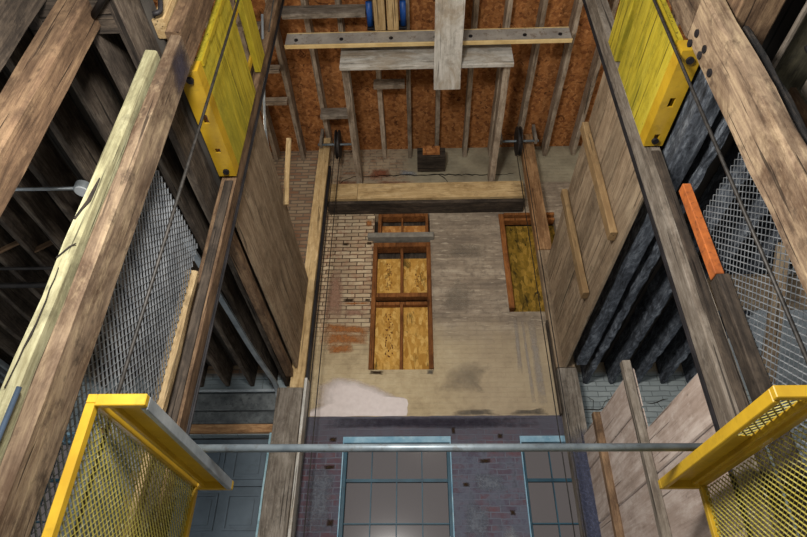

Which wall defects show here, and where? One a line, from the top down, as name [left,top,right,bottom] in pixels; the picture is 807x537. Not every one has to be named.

crack [74,178,100,219]
crack [4,243,76,388]
peeling [345,299,370,315]